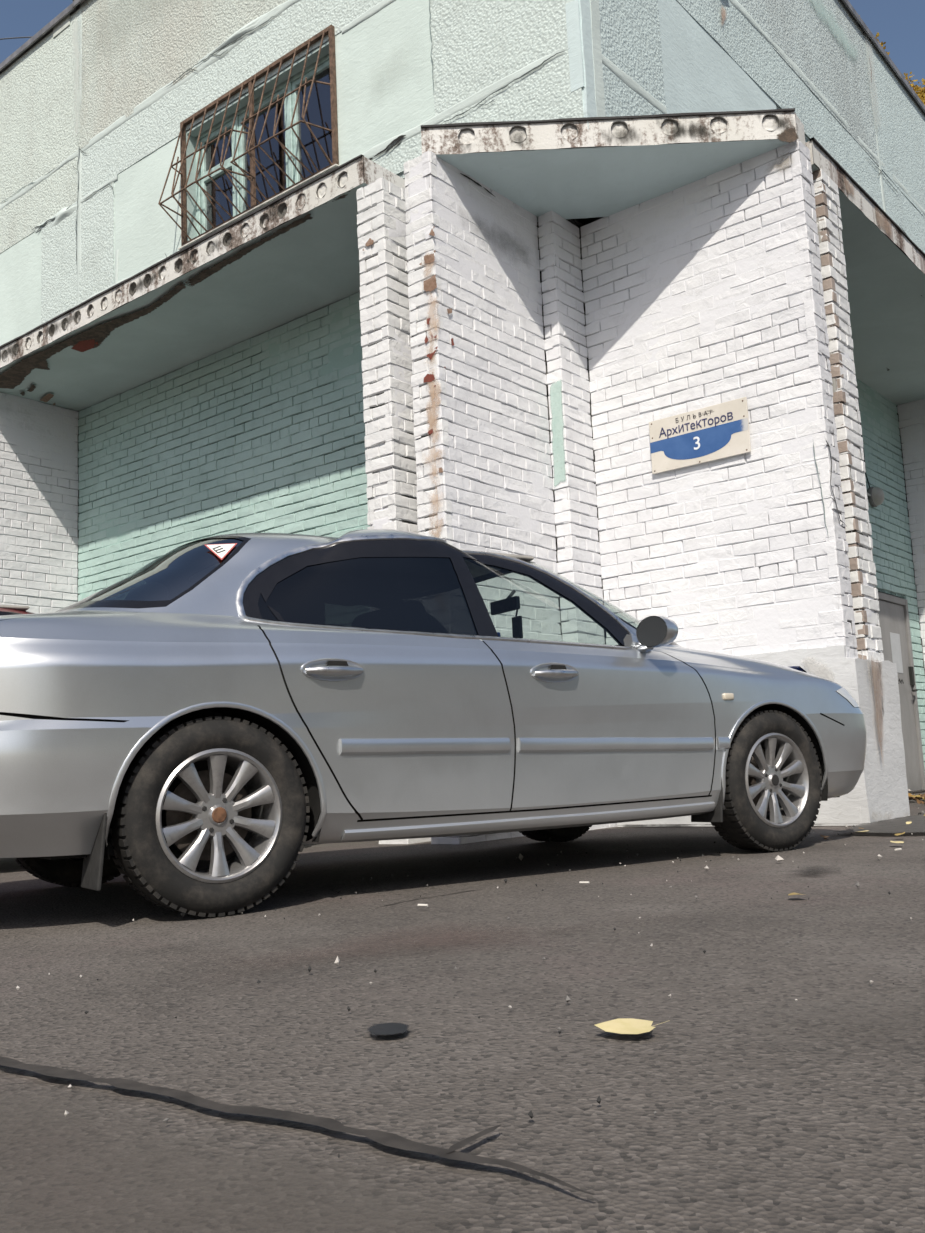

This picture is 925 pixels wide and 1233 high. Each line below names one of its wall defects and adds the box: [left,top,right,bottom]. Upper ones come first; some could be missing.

spalling [777,128,798,143]
spalling [0,214,313,405]
rust [428,381,439,476]